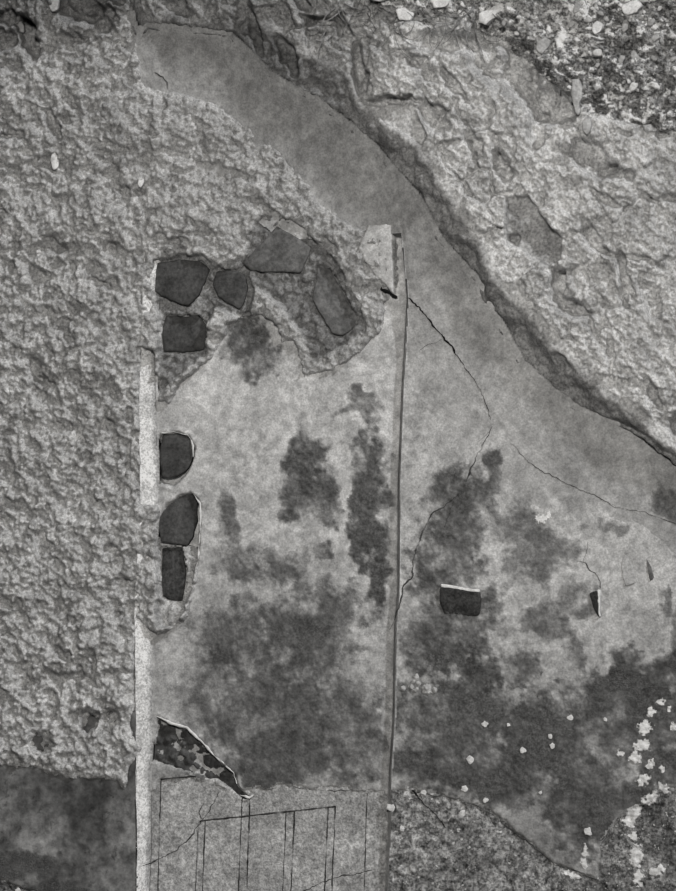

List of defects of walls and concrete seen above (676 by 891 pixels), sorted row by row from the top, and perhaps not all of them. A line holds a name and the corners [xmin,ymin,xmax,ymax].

spalling [131,0,676,465]
spalling [0,0,390,799]
water stain [278,408,393,613]
crack [380,287,492,630]
crack [518,451,675,524]
spalling [400,673,437,695]
water stain [189,450,676,887]
crack [304,869,374,891]
crack [412,790,446,828]